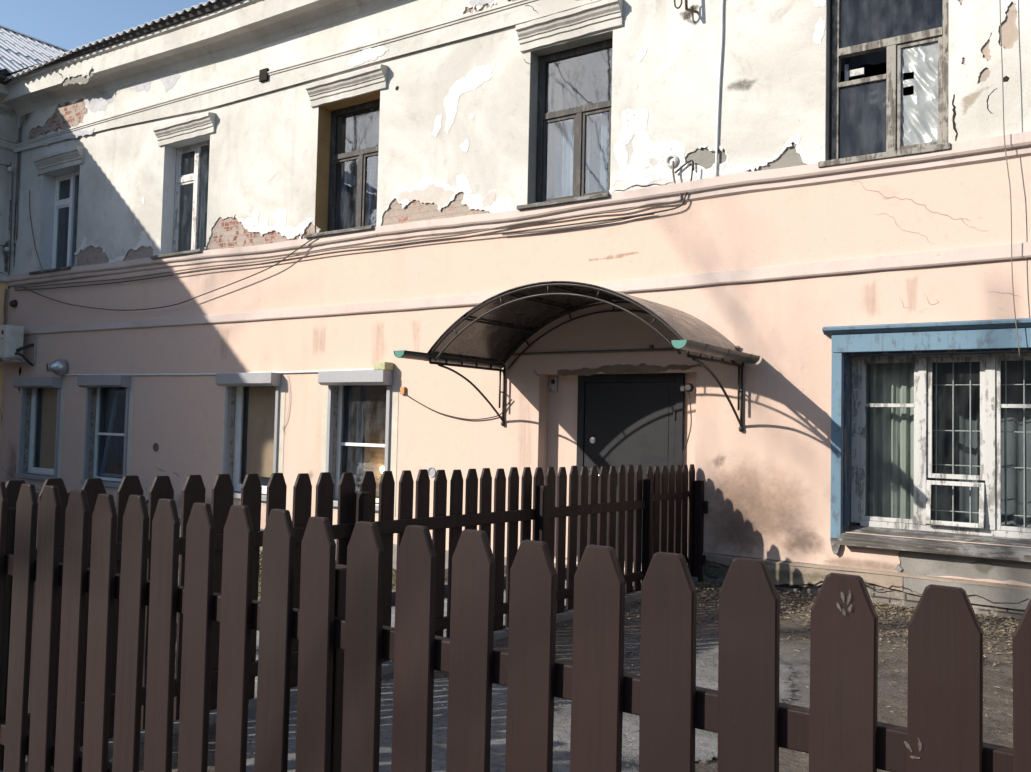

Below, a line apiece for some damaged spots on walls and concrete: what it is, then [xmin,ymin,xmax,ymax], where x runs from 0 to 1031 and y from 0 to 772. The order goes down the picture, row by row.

spalling [464,0,517,14]
peeling [348,46,388,67]
spalling [978,2,1019,84]
spalling [29,71,180,146]
peeling [432,65,493,137]
peeling [609,108,823,193]
spalling [73,219,154,267]
spalling [205,209,320,250]
spalling [381,174,509,226]
crack [853,181,988,244]